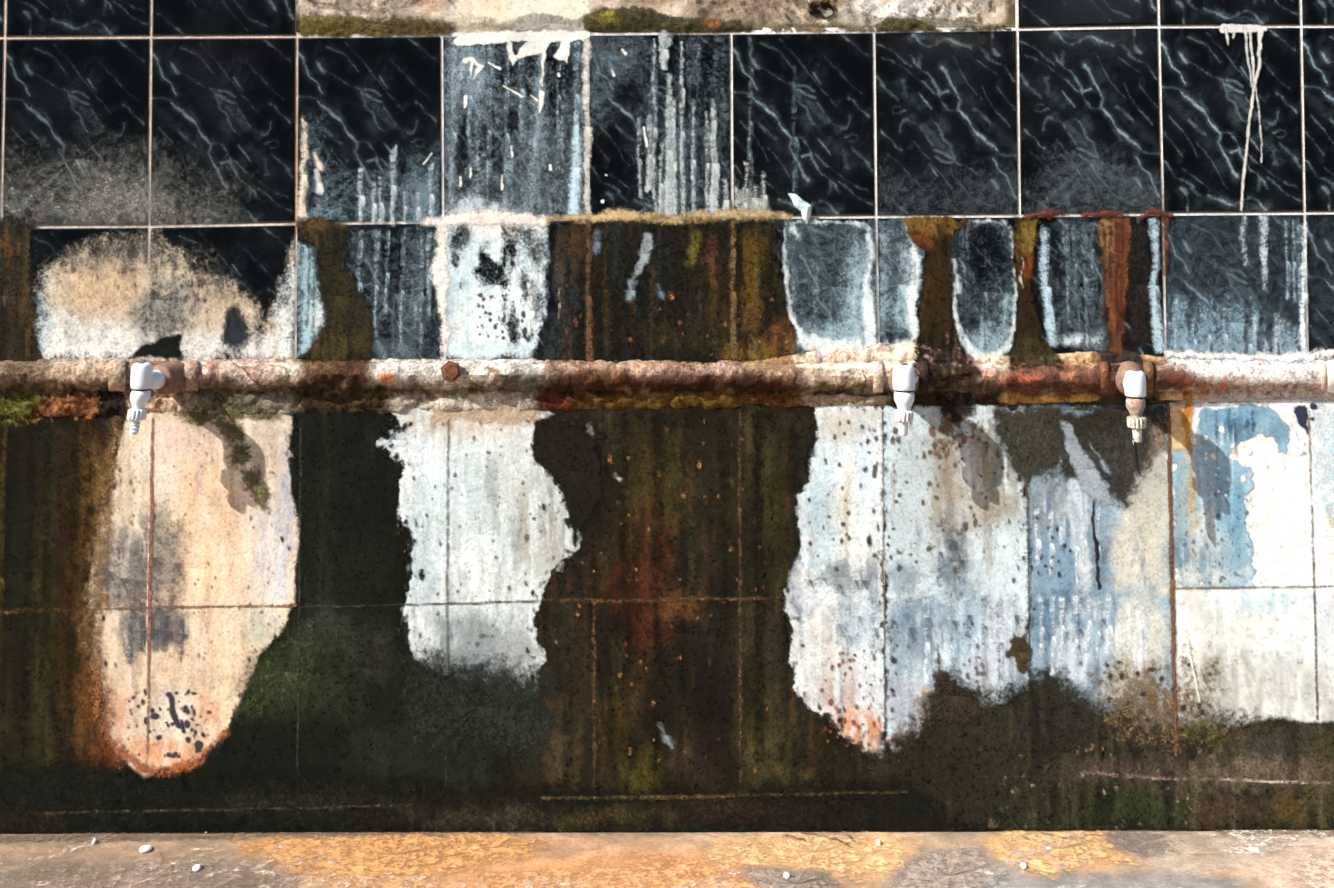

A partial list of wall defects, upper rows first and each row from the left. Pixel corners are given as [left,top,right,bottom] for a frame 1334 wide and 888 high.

flaking render [295,0,541,33]
flaking render [587,0,883,33]
flaking render [900,0,1015,33]
damp [0,161,325,362]
corrosion [379,372,395,385]
damp [297,30,925,371]
damp [951,207,1018,362]
damp [1039,224,1108,349]
corrosion [1013,207,1173,397]
damp [69,409,314,778]
damp [750,399,1334,762]
corrosion [115,730,227,777]